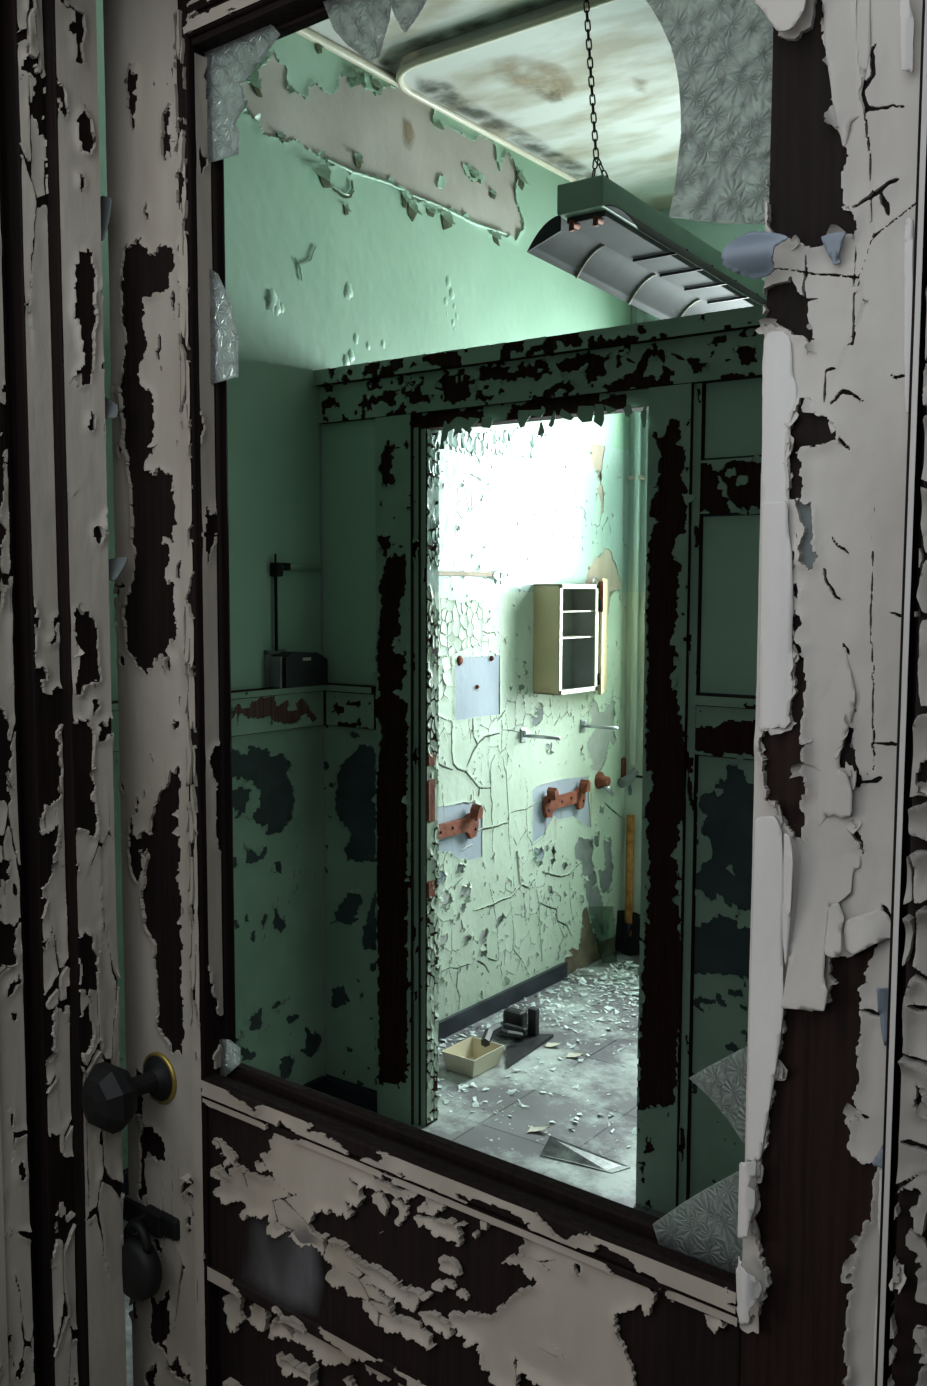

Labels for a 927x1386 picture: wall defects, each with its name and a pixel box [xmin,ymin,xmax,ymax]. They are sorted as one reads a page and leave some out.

peeling [69,196,112,387]
flaking render [242,52,529,246]
crack [824,254,861,403]
crack [857,181,897,215]
crack [862,46,905,112]
peeling [105,240,178,674]
peeling [129,766,185,1054]
peeling [335,535,411,1086]
crack [438,598,582,1006]
peeling [358,0,927,1386]
crack [825,541,901,783]
crack [904,1139,927,1147]